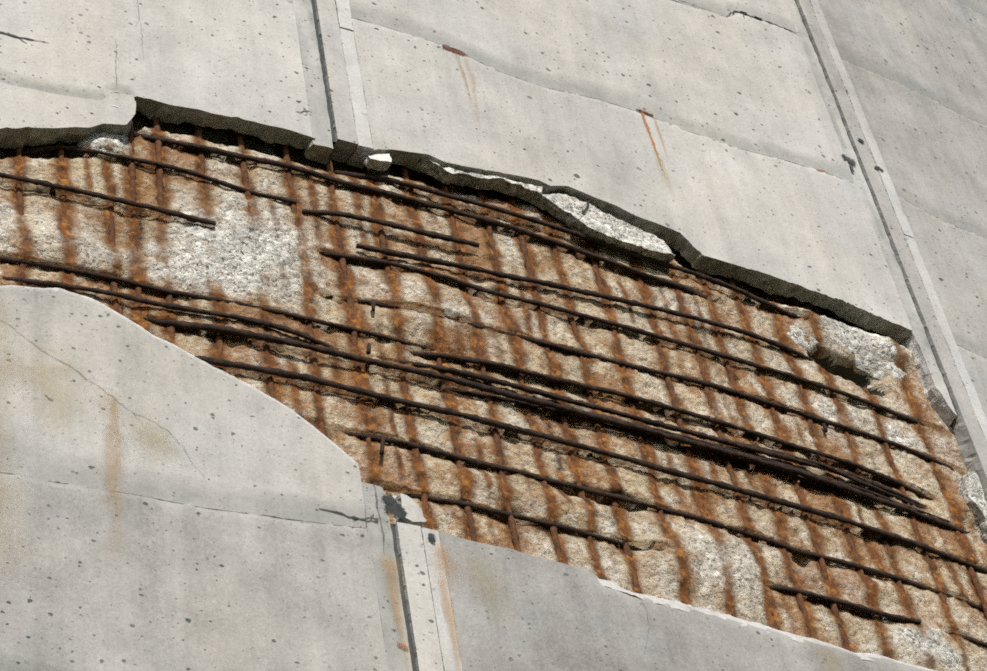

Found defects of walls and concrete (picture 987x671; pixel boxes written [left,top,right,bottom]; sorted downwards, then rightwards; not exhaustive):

crack [0,31,49,43]
corrosion [7,142,75,292]
corrosion [85,134,188,345]
corrosion [146,117,210,241]
corrosion [228,129,259,216]
corrosion [636,109,662,167]
corrosion [210,288,227,372]
spalling [0,110,559,562]
corrosion [259,143,436,530]
spalling [347,154,987,671]
corrosion [392,164,987,671]